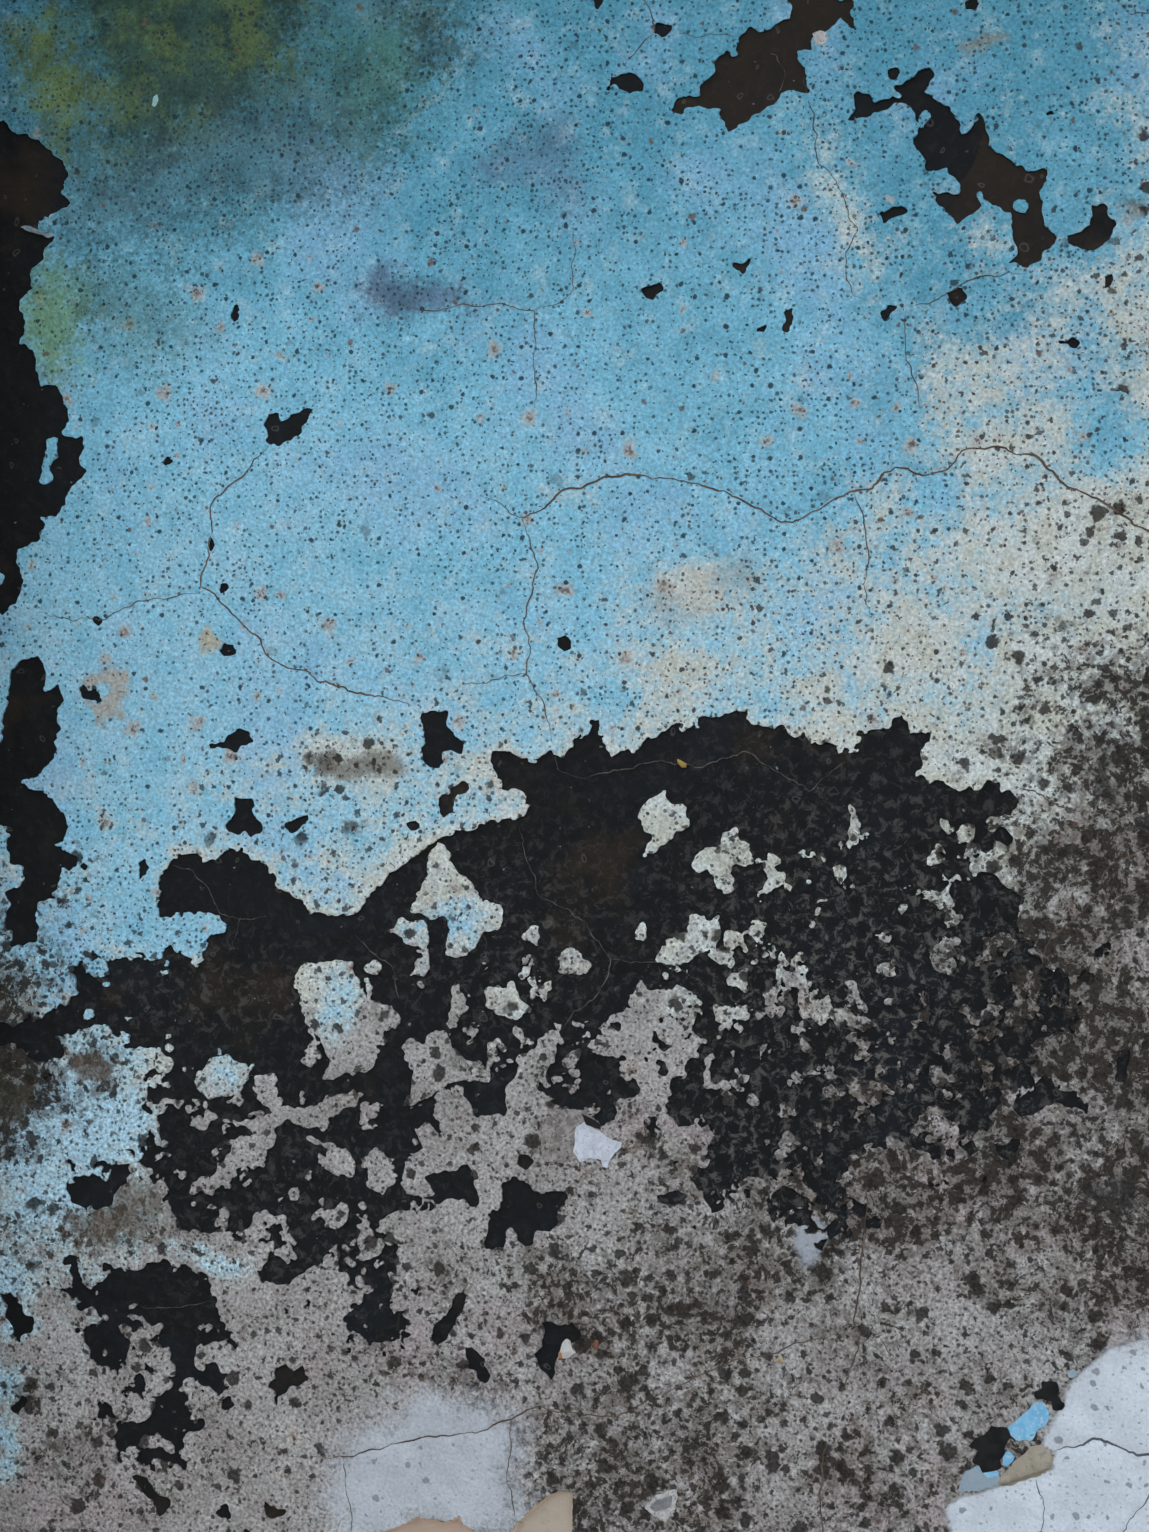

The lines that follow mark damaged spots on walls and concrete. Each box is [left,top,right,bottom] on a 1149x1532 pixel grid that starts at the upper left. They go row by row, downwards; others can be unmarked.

peeling [671,0,856,132]
peeling [848,68,1116,268]
peeling [0,121,87,615]
crack [43,449,410,705]
crack [466,445,1149,792]
peeling [0,656,88,947]
peeling [0,710,1111,1356]
peeling [47,1255,238,1516]
peeling [268,1364,309,1404]
peeling [465,1347,491,1383]
peeling [535,1321,581,1380]
crack [1036,1437,1149,1531]